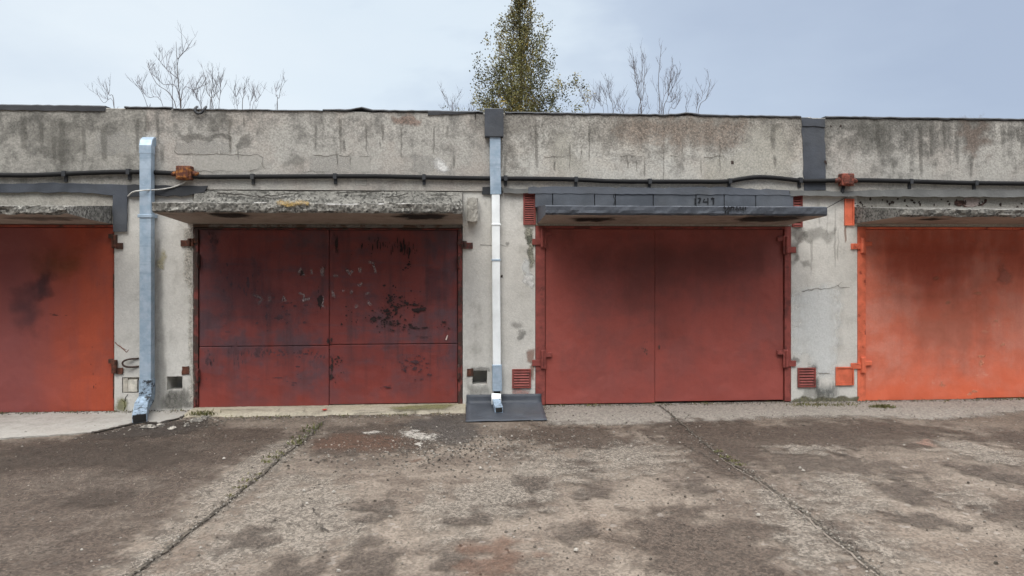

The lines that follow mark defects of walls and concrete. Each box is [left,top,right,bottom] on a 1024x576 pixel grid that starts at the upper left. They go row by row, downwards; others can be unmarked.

peeling [934,197,1002,207]
peeling [340,285,450,338]